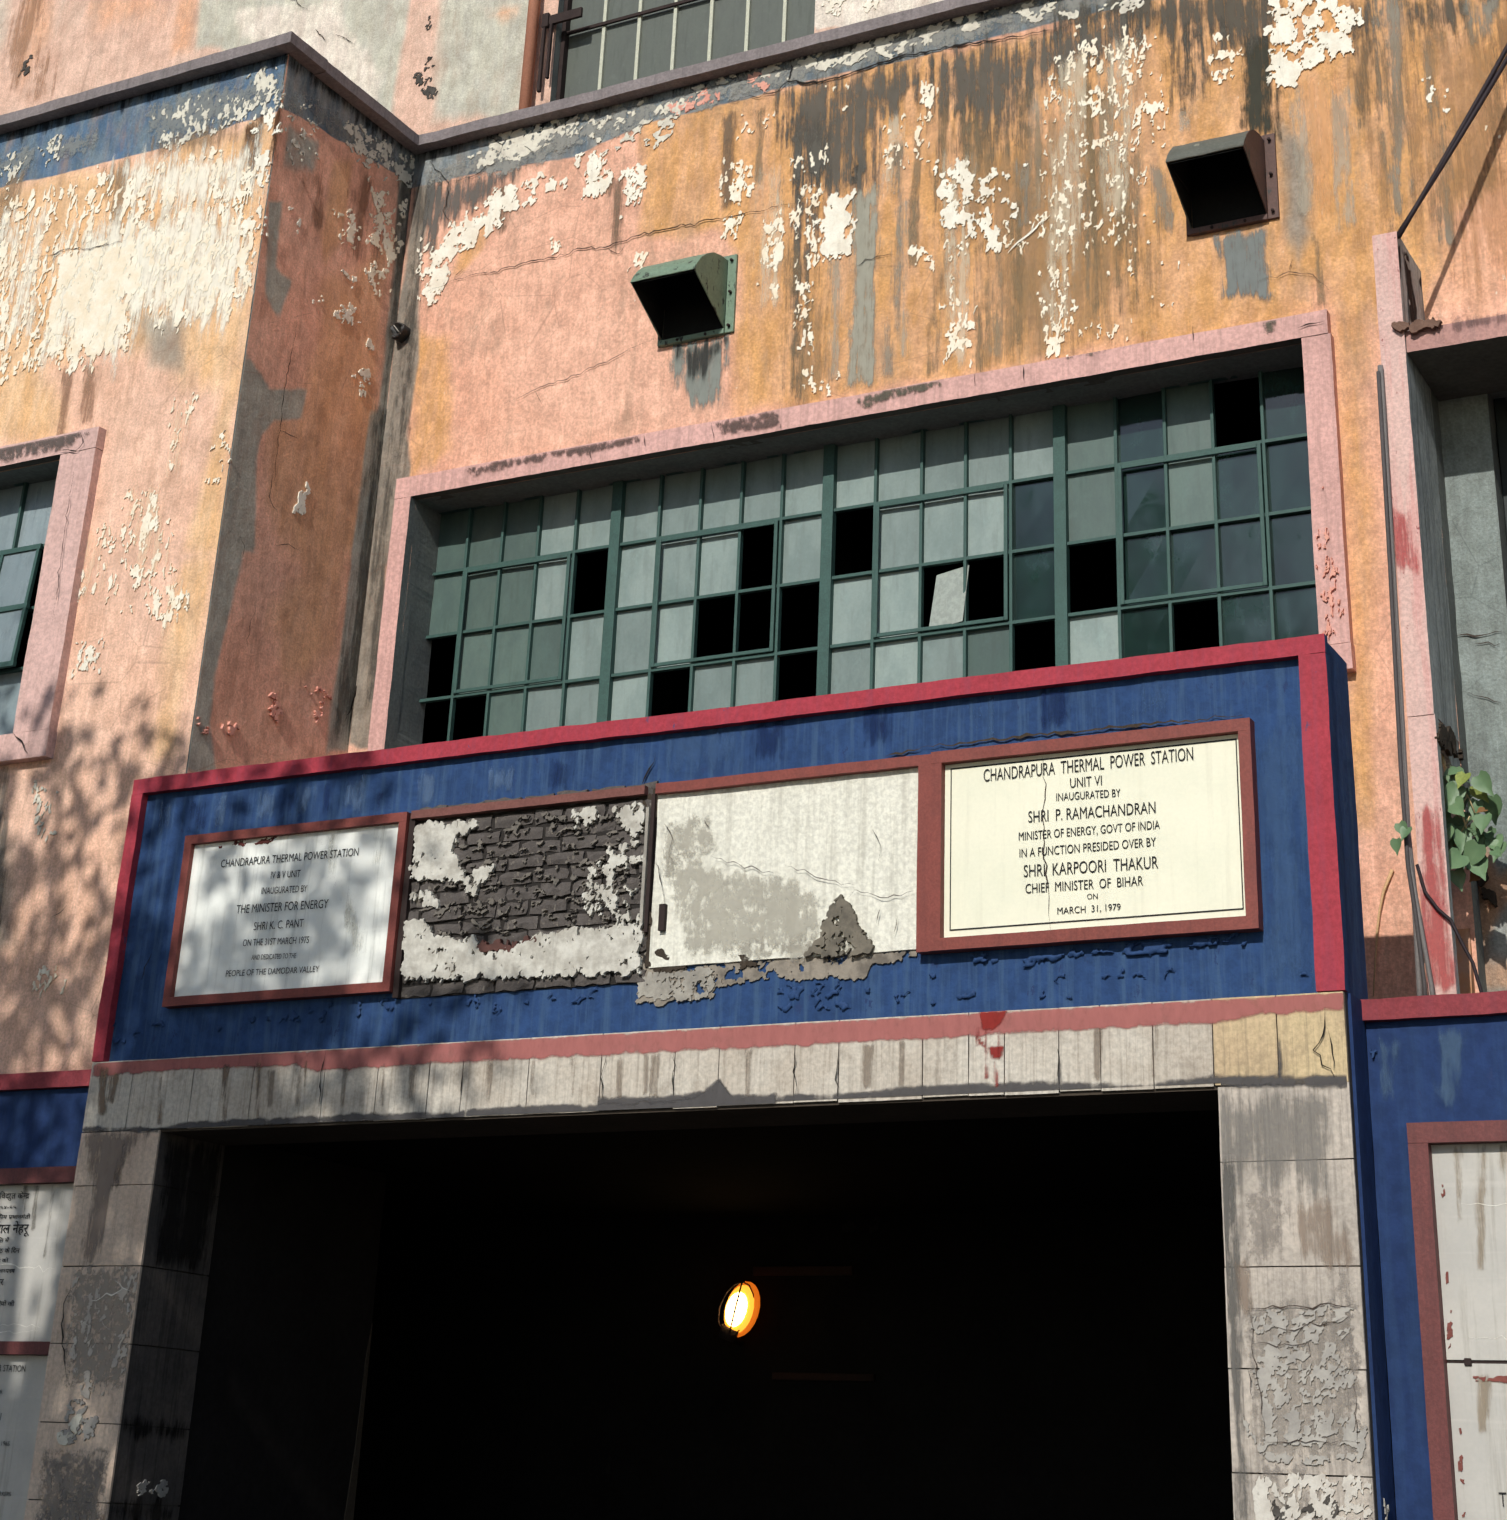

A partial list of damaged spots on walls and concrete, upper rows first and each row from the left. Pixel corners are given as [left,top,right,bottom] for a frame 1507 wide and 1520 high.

peeling [1207,32,1244,85]
peeling [1263,0,1365,89]
peeling [0,66,320,385]
damp [608,178,623,247]
damp [722,113,736,207]
peeling [312,0,1169,398]
damp [755,0,1283,408]
damp [1316,248,1324,303]
peeling [77,489,191,629]
flaking render [477,935,537,953]
flaking render [635,894,918,1007]
spalling [1272,1494,1341,1520]